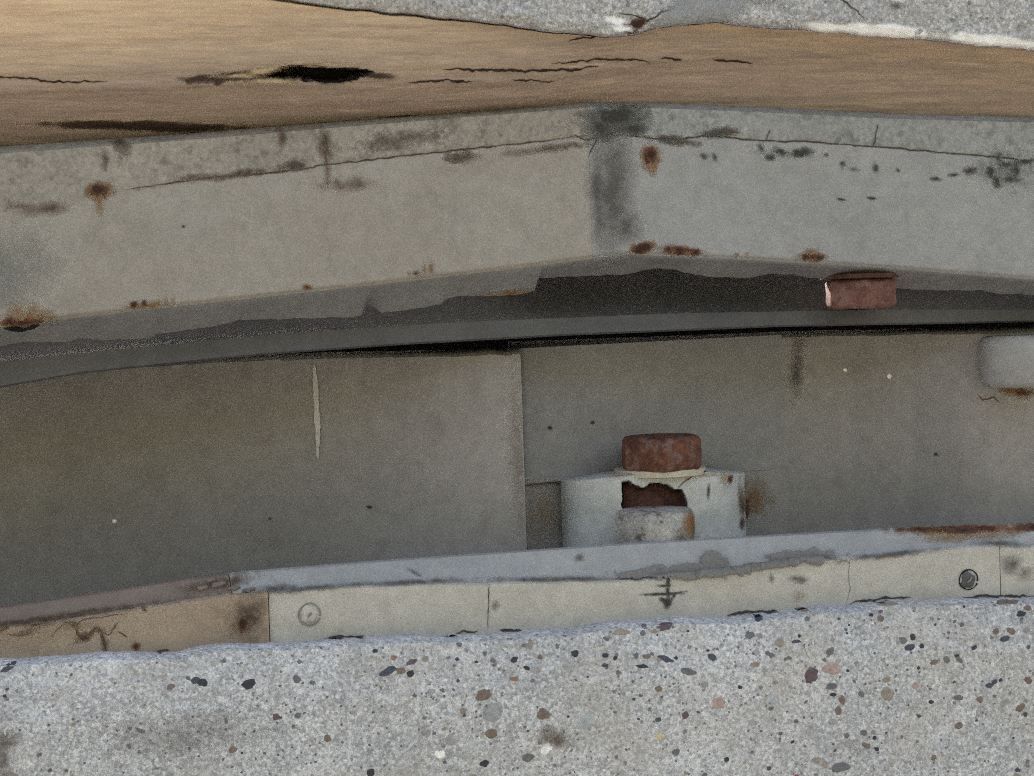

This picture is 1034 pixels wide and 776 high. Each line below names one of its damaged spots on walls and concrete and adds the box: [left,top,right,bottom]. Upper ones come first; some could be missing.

mould [706,129,727,138]
damp [580,105,649,239]
corrosion [641,146,660,174]
mould [758,145,828,161]
mould [930,152,1034,188]
corrosion [85,182,112,213]
corrosion [631,242,700,256]
corrosion [0,306,49,328]
corrosion [725,476,763,529]
corrosion [896,522,1034,541]
crack [0,614,128,651]